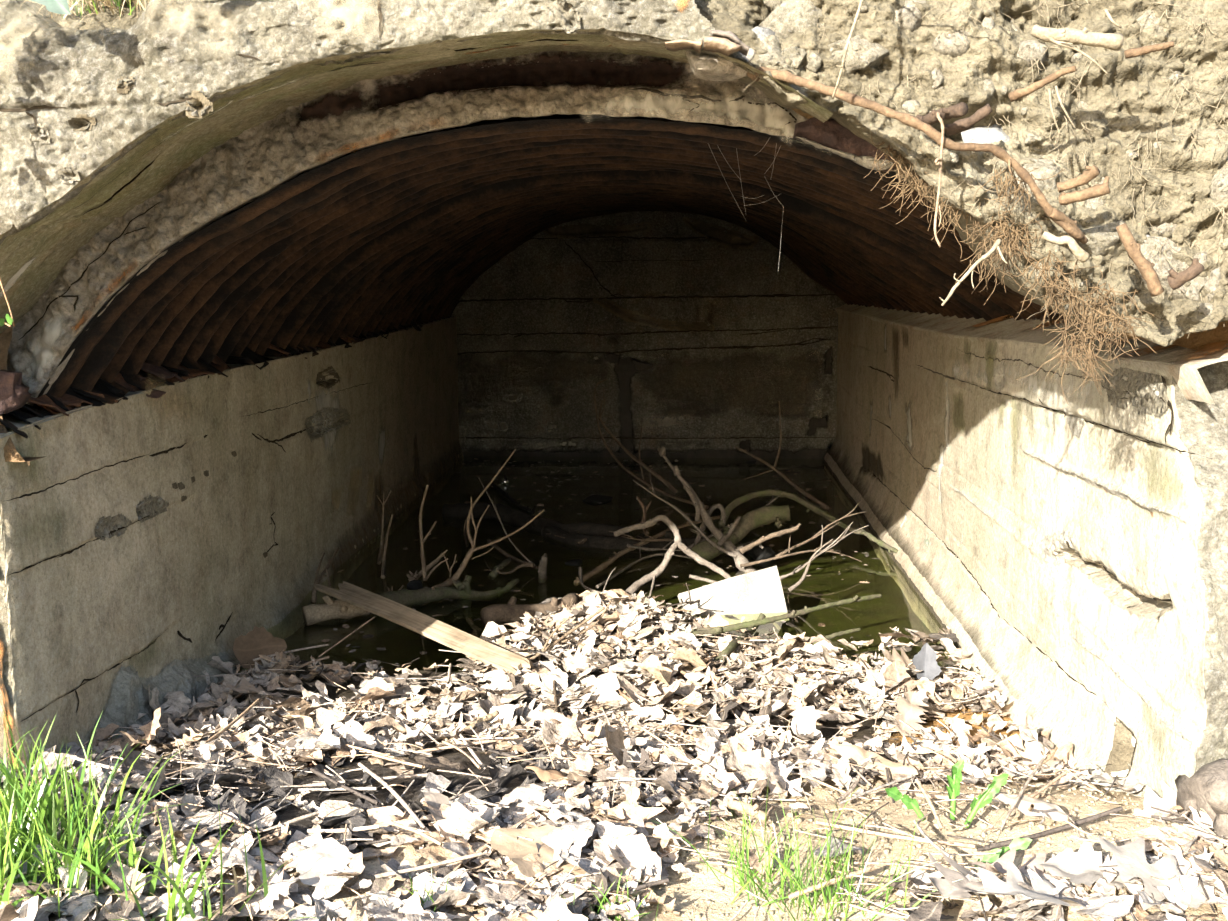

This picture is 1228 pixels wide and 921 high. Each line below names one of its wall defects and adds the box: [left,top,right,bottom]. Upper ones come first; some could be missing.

crack [0,105,66,127]
crack [157,97,193,106]
rust [967,314,1068,330]
rust [1083,329,1228,357]
rust [0,320,421,439]
crack [869,351,1212,459]
crack [6,435,207,501]
crack [5,512,156,578]
crack [873,474,1115,714]
spalling [1051,544,1173,621]
crack [0,612,233,758]
spalling [1104,717,1137,785]